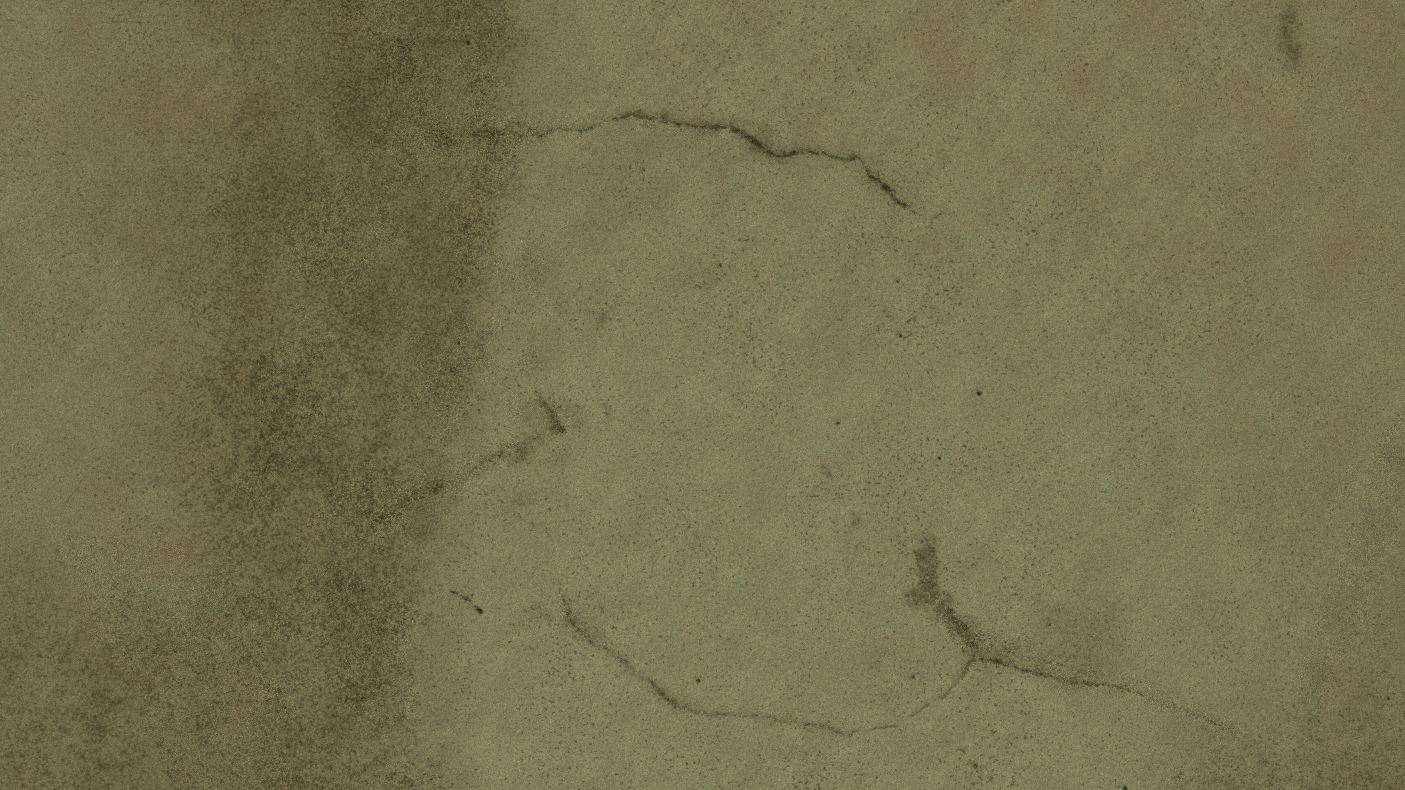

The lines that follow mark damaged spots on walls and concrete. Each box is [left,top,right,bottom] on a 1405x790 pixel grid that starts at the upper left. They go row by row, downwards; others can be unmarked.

crack [724,127,818,156]